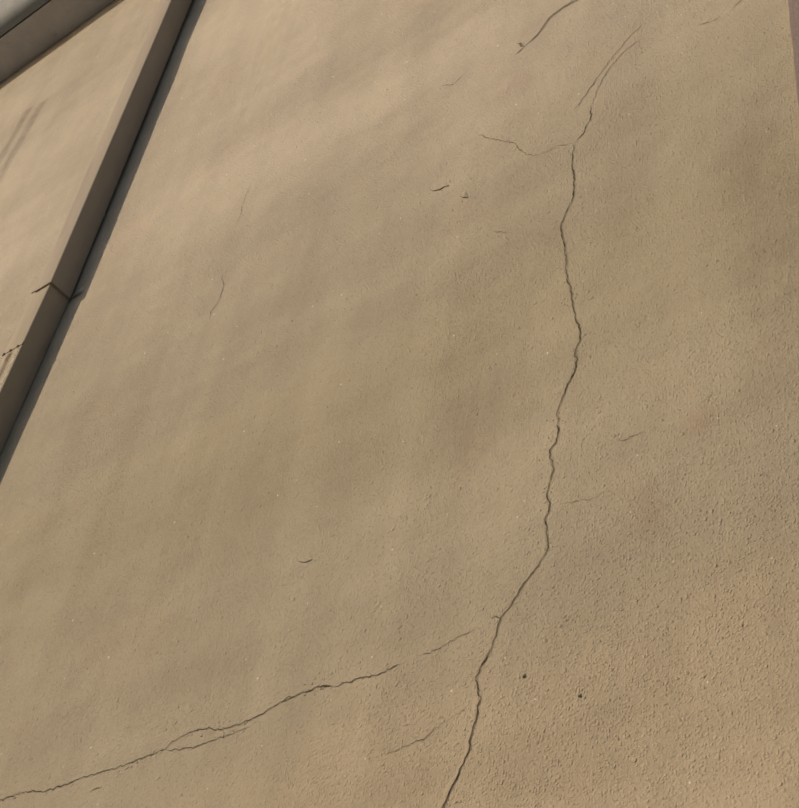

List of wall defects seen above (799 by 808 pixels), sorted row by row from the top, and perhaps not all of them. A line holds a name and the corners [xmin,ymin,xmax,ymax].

crack [516,0,576,54]
crack [387,23,644,808]
crack [0,664,398,801]